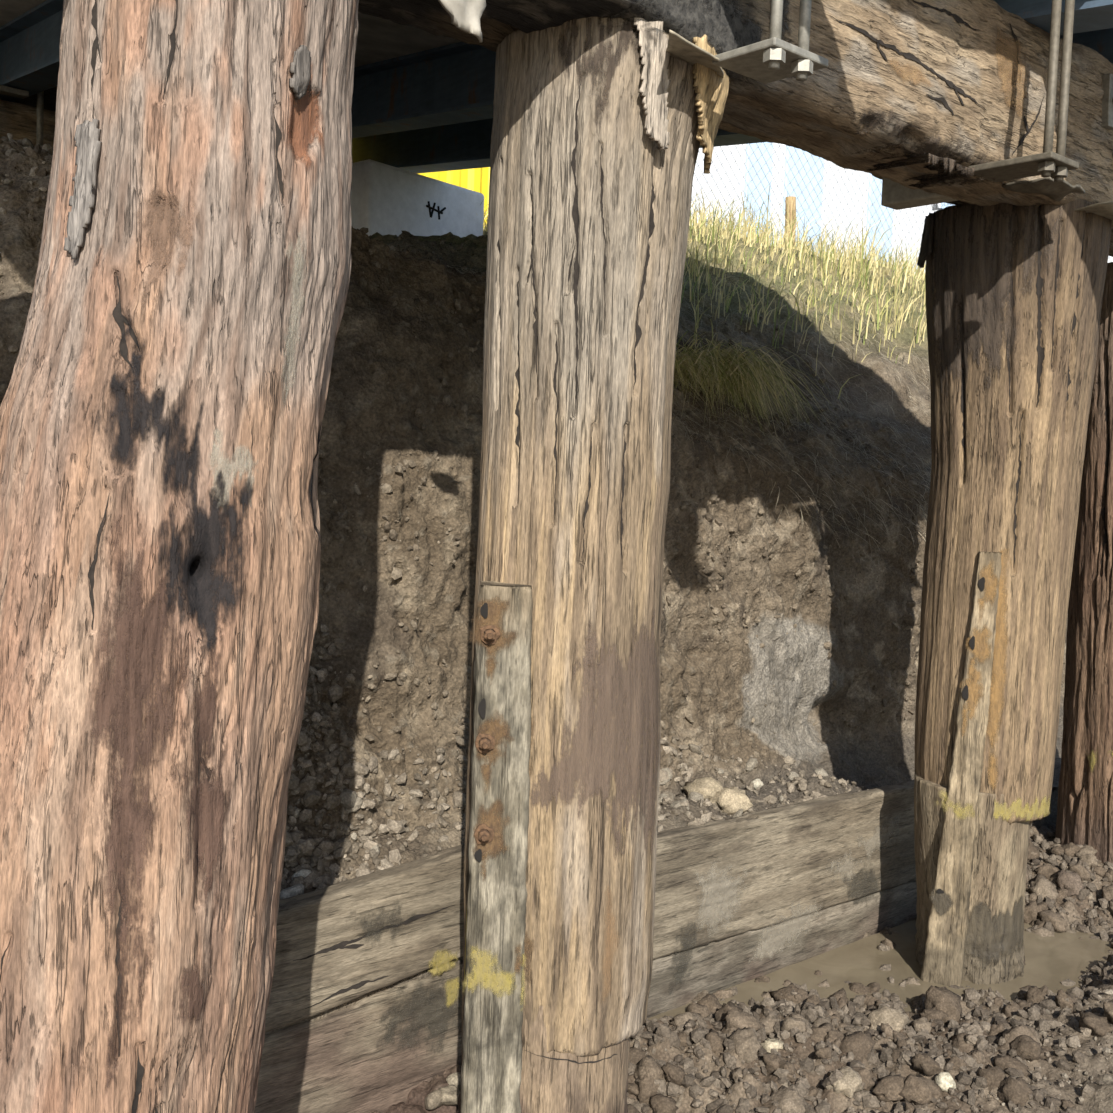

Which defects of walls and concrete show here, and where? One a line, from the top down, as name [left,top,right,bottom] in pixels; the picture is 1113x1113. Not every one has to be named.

crack [913,0,979,30]
crack [832,16,987,115]
crack [1010,24,1044,155]